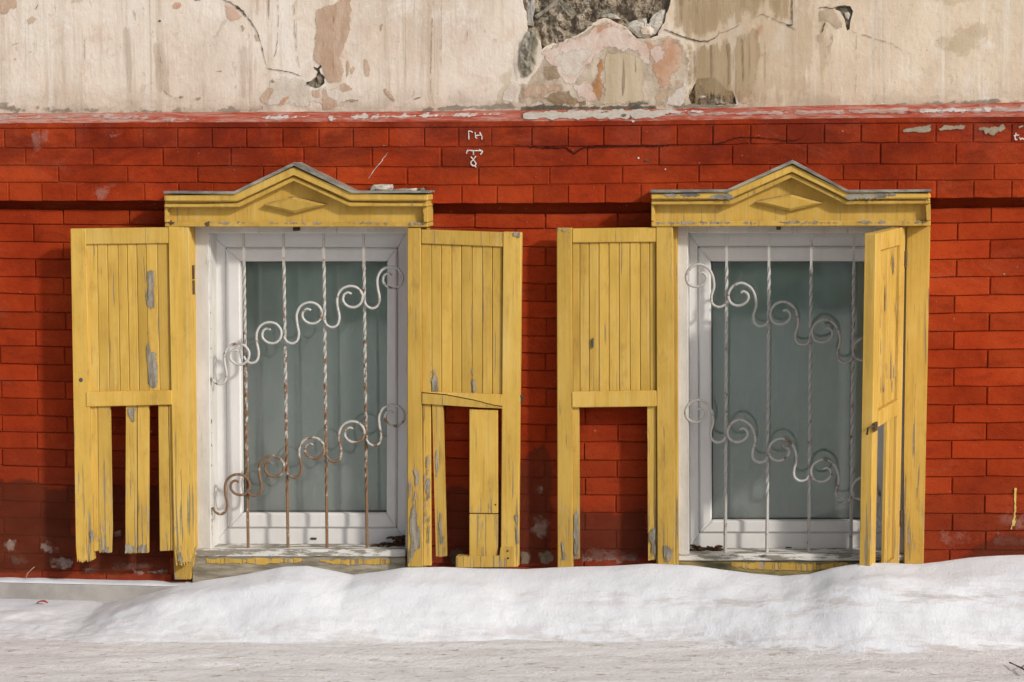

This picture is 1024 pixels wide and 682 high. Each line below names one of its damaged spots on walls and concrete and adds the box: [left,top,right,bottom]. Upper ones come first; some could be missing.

crack [224,0,299,75]
peeling [260,0,496,121]
peeling [503,0,1024,135]
peeling [146,332,158,388]
peeling [125,544,147,554]
peeling [731,562,852,571]